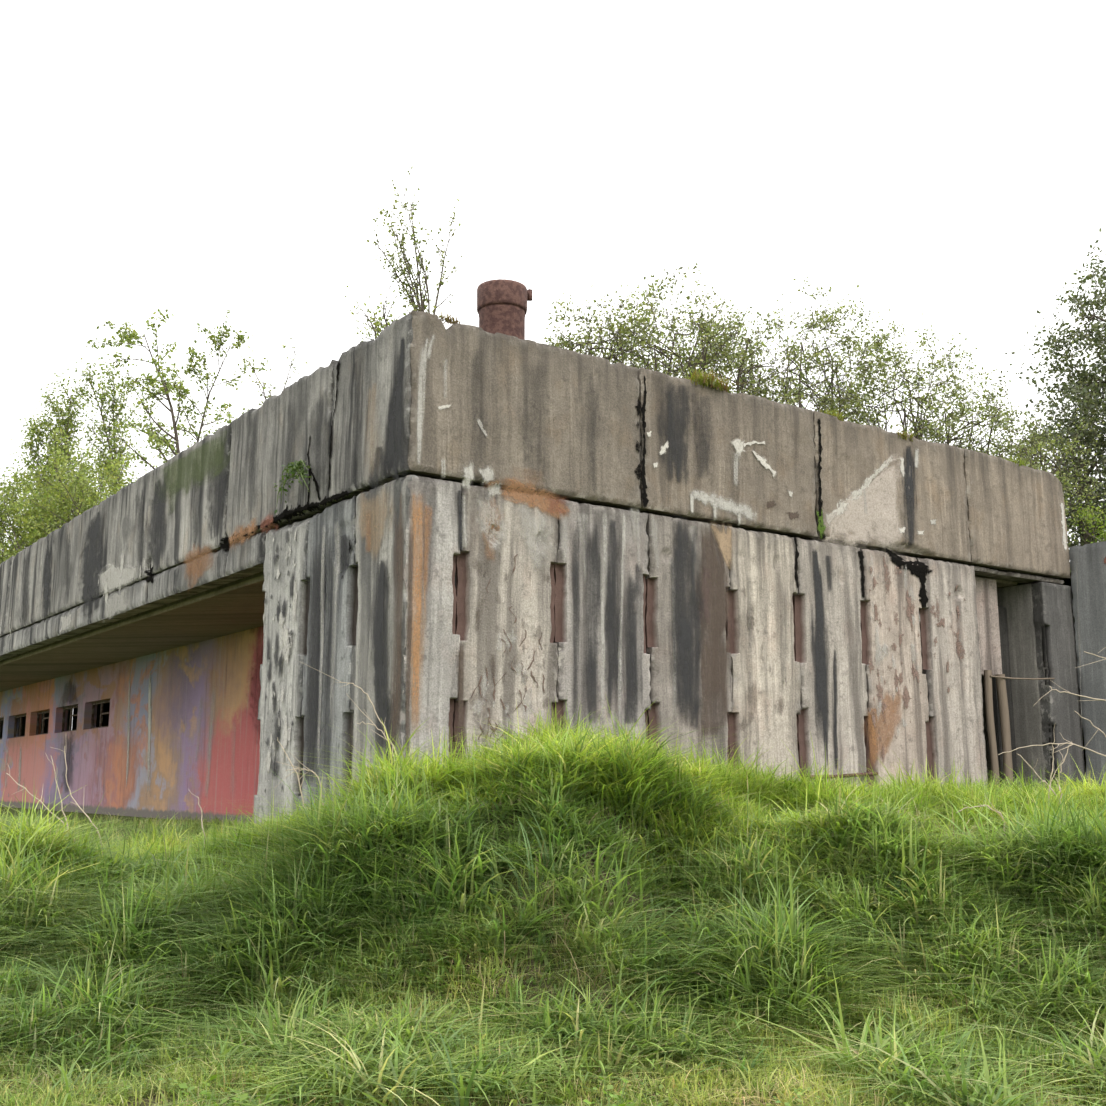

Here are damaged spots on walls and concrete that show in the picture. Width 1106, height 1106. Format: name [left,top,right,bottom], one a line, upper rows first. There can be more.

damp [0,558,27,639]
damp [42,546,71,632]
damp [67,477,166,616]
damp [194,445,226,537]
crack [232,362,348,537]
corrosion [406,502,429,757]
corrosion [482,479,568,536]
crack [635,376,649,508]
damp [659,385,689,481]
crack [794,418,826,588]
crack [857,551,865,597]
corrosion [869,695,900,762]